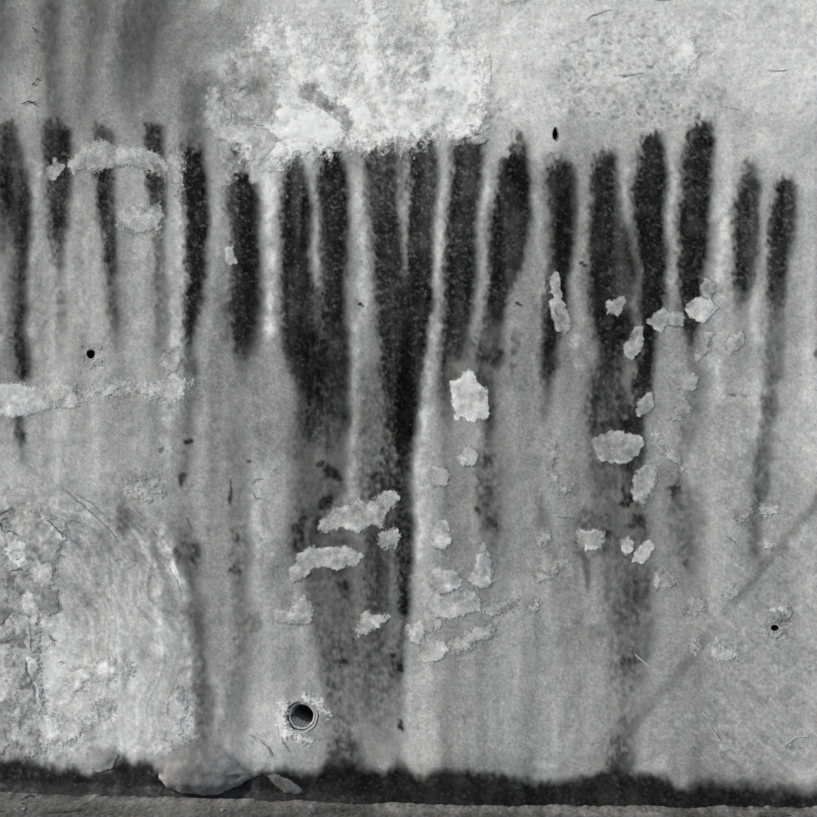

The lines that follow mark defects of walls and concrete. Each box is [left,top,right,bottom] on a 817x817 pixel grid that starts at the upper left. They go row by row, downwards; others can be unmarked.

damp [43,121,71,269]
peeling [116,143,167,174]
damp [180,129,210,372]
damp [226,164,260,354]
damp [279,147,349,424]
damp [364,125,483,470]
damp [479,133,531,365]
damp [541,160,577,390]
damp [587,130,668,437]
damp [676,117,715,346]
damp [731,165,796,318]
damp [0,743,817,808]